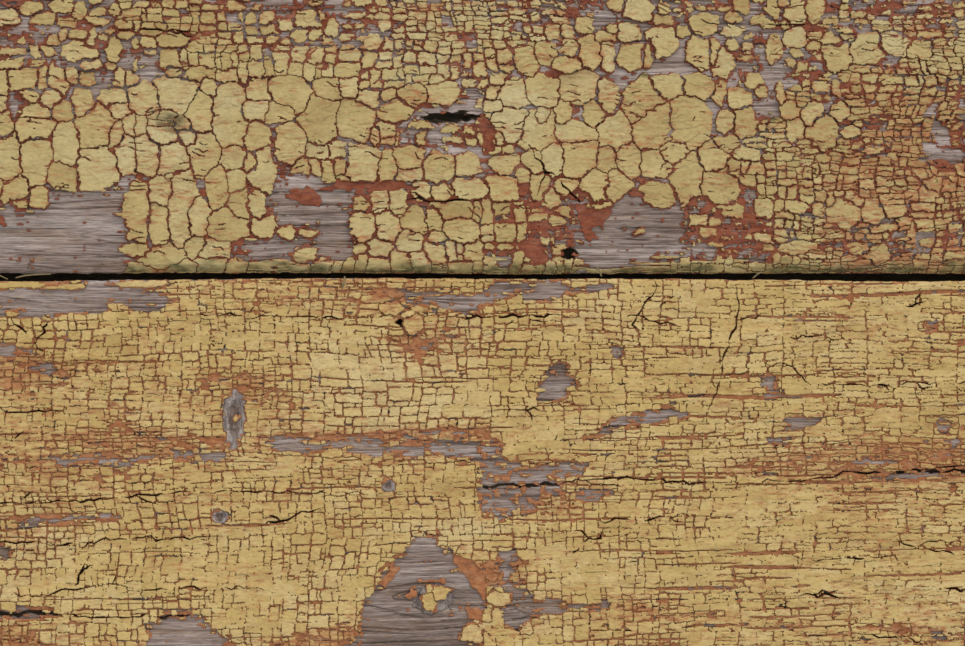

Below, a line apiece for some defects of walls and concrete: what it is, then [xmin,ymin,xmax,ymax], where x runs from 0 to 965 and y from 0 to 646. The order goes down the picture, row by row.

peeling [0,0,965,324]
crack [465,313,552,322]
peeling [534,355,581,406]
peeling [583,402,689,442]
crack [0,491,189,504]
crack [217,490,352,524]
peeling [245,421,621,525]
crack [482,476,721,489]
crack [761,465,965,484]
crack [0,535,206,619]
peeling [142,531,725,646]
peeling [0,601,64,646]